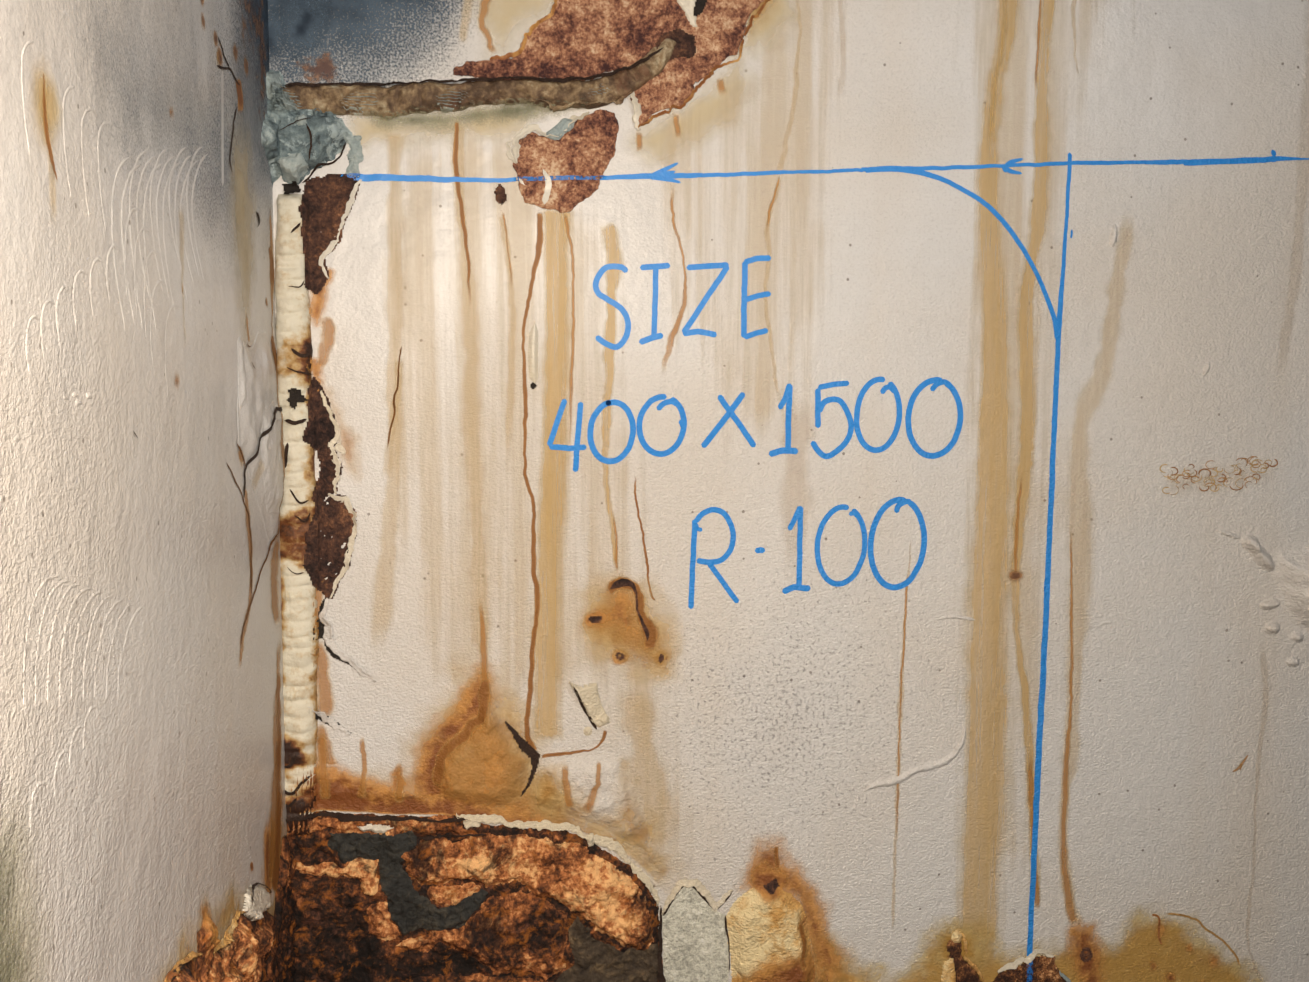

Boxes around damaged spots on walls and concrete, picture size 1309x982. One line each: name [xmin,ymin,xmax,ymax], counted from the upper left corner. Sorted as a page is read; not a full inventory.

rust [40,74,58,178]
water stain [358,100,555,141]
peeling [494,184,507,205]
rust [1009,0,1054,590]
crack [287,348,313,375]
crack [226,407,310,661]
rust [164,0,770,982]
rust [941,547,1101,982]
peeling [242,862,272,921]
peeling [661,879,734,982]
water stain [898,927,1083,982]
water stain [1099,913,1258,982]